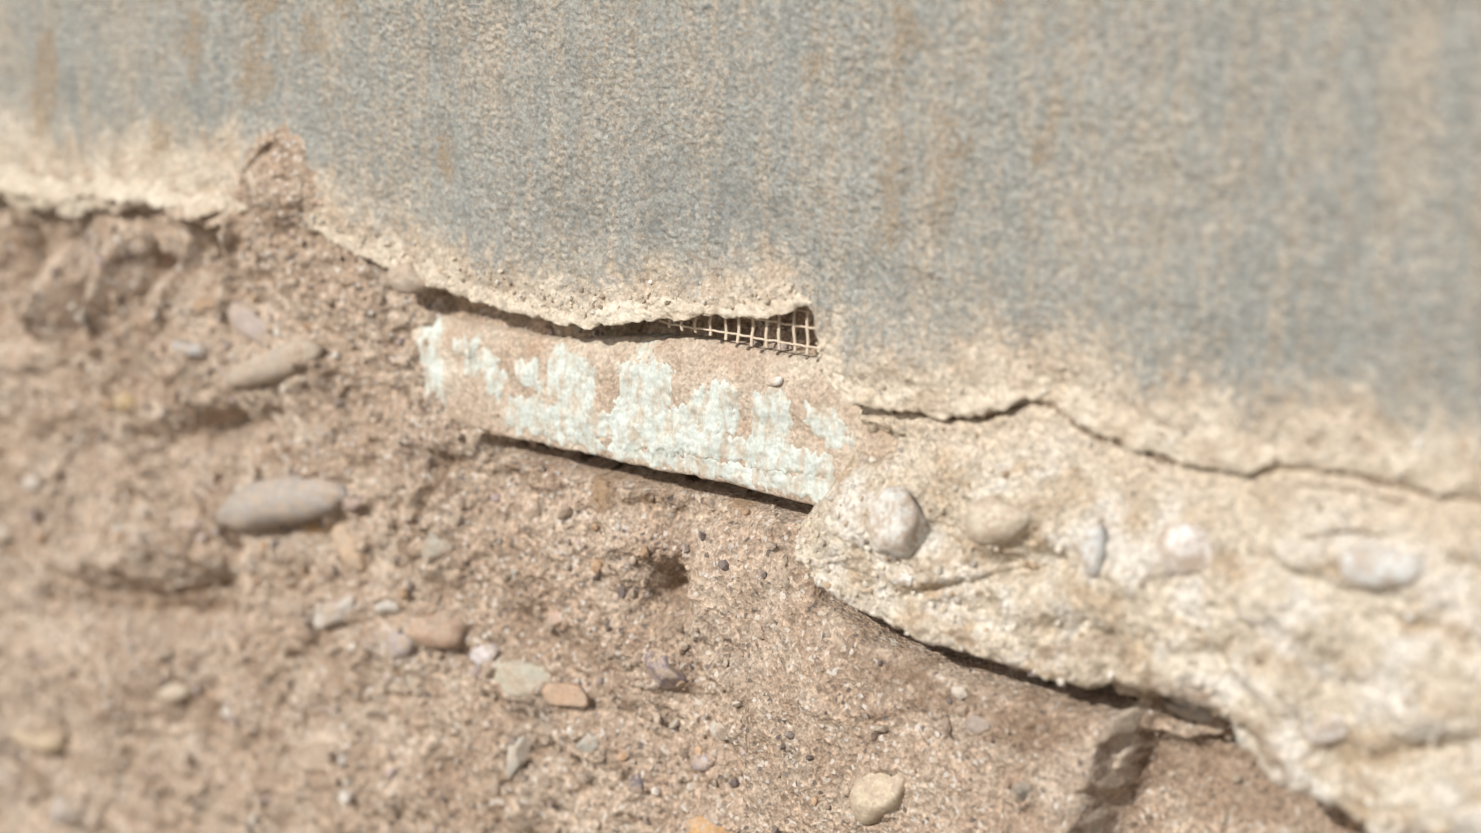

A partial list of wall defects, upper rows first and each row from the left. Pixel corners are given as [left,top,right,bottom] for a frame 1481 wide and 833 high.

peeling [0,166,235,229]
peeling [309,221,1481,506]
crack [892,401,1481,505]
crack [1295,529,1386,541]
spalling [634,549,684,572]
spalling [121,607,193,653]
spalling [1078,682,1234,833]
spalling [1254,815,1299,833]
spalling [1319,800,1338,818]